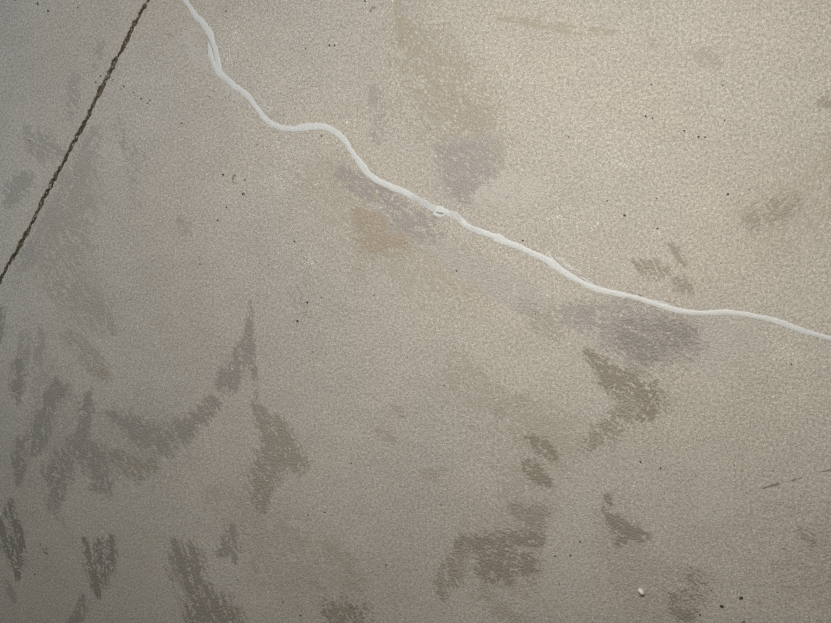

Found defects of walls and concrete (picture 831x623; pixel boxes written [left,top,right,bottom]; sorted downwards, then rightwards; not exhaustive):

crack [412,194,482,235]